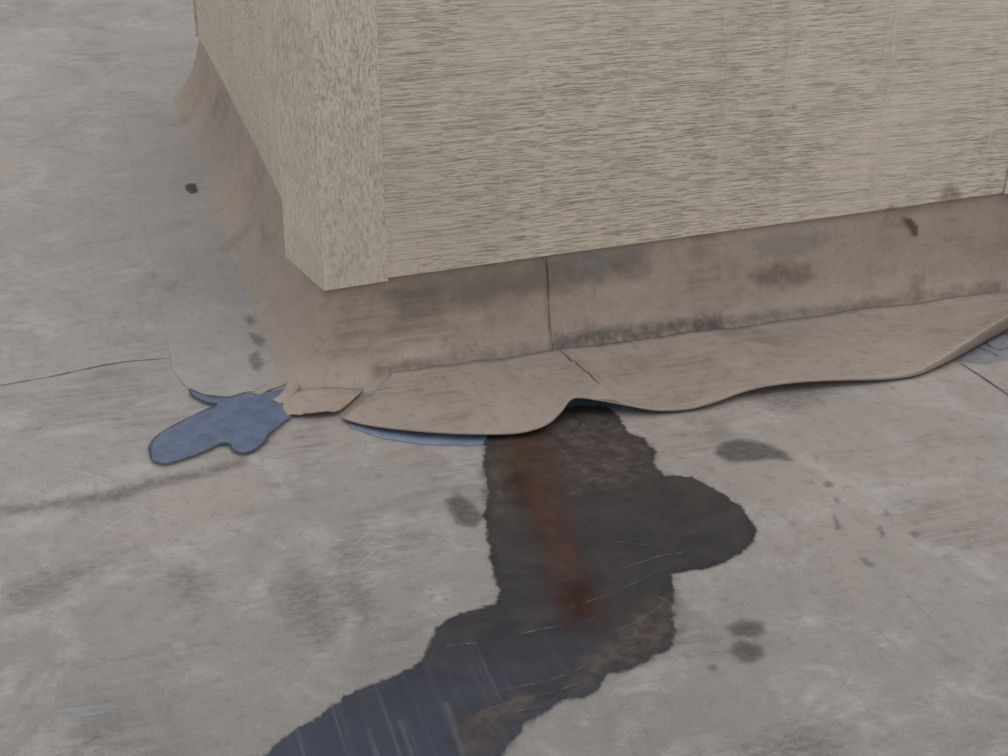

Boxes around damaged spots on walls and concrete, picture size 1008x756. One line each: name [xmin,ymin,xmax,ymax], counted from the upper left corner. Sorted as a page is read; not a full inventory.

leakage [906,219,918,236]
crack [546,259,600,384]
peeling [148,388,292,464]
leakage [718,440,786,460]
leakage [265,405,761,756]